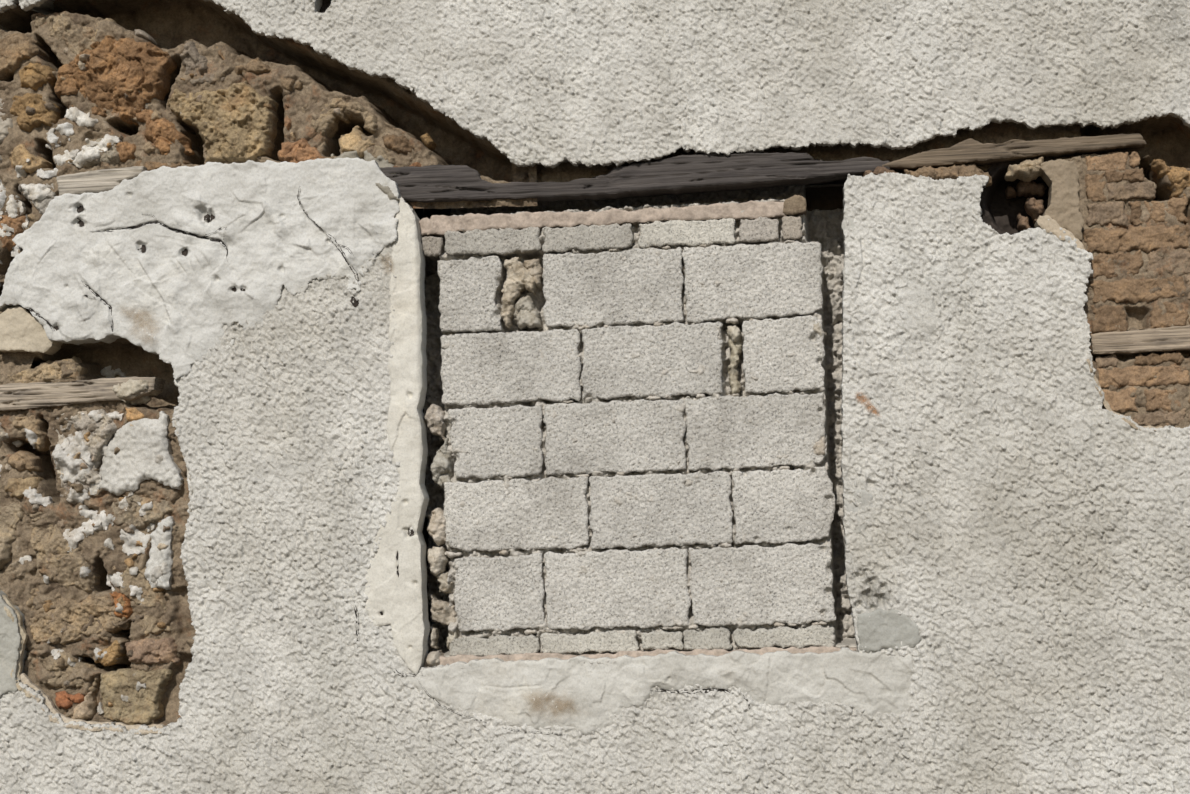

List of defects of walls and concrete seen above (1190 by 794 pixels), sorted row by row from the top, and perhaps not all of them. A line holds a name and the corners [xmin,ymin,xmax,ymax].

crack [81,280,113,332]
crack [98,214,228,261]
crack [297,187,359,285]
spalling [0,0,704,296]
spalling [758,115,1190,431]
spalling [0,338,196,735]